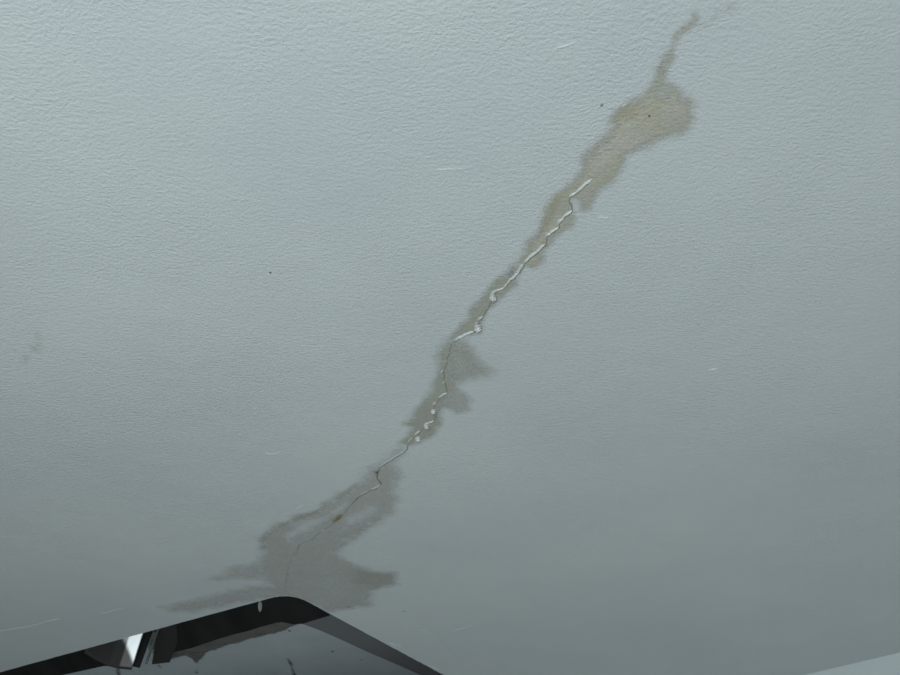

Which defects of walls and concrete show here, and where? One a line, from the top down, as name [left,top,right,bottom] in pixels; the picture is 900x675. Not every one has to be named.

leakage [183,470,392,610]
crack [285,179,592,591]
leakage [403,50,692,445]